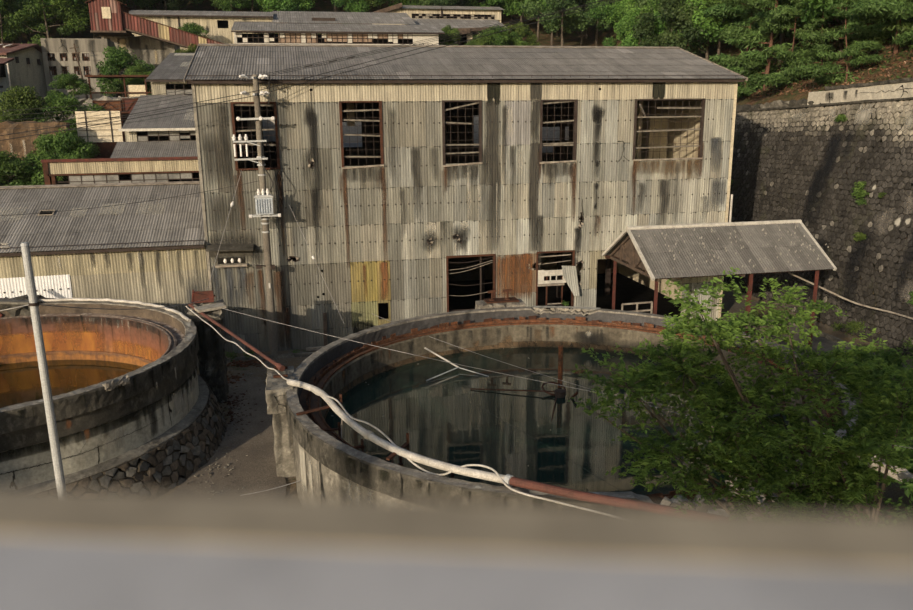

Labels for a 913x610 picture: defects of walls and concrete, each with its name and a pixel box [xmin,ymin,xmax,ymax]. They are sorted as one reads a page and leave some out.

damp [309,117,319,238]
damp [447,84,515,237]
damp [529,101,573,248]
damp [712,138,721,161]
damp [806,131,853,208]
corrosion [497,253,532,296]
corrosion [0,332,103,355]